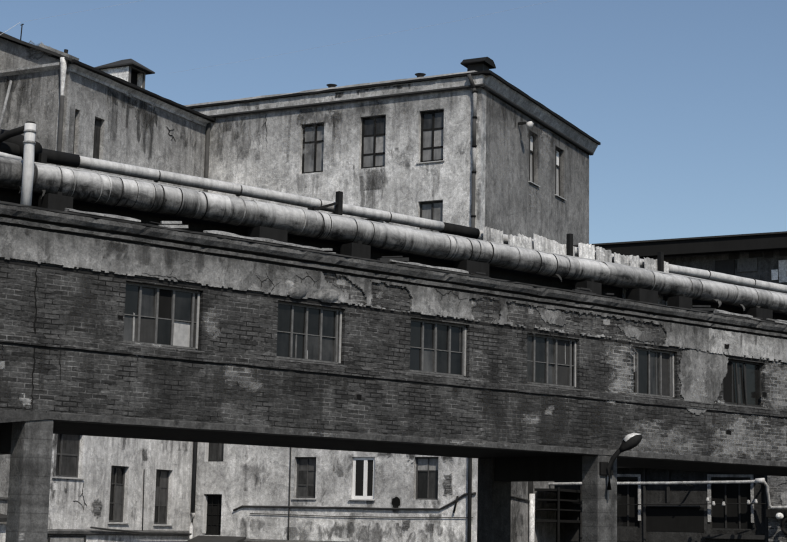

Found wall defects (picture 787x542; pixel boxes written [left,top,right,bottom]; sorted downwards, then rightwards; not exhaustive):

damp [113,92,158,154]
flaking render [324,275,366,305]
crack [0,269,64,409]
flaking render [443,473,452,496]
damp [319,522,382,542]